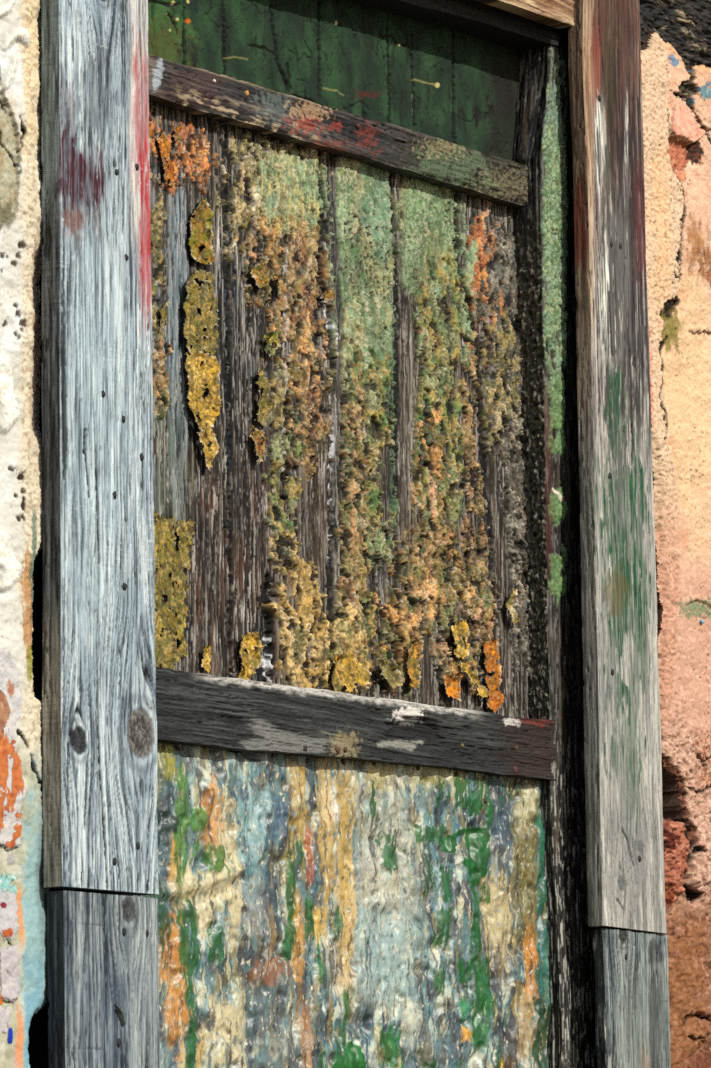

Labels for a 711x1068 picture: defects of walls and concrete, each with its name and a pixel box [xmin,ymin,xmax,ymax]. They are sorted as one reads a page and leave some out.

crack [667,92,711,144]
crack [673,171,685,278]
spalling [661,754,699,907]